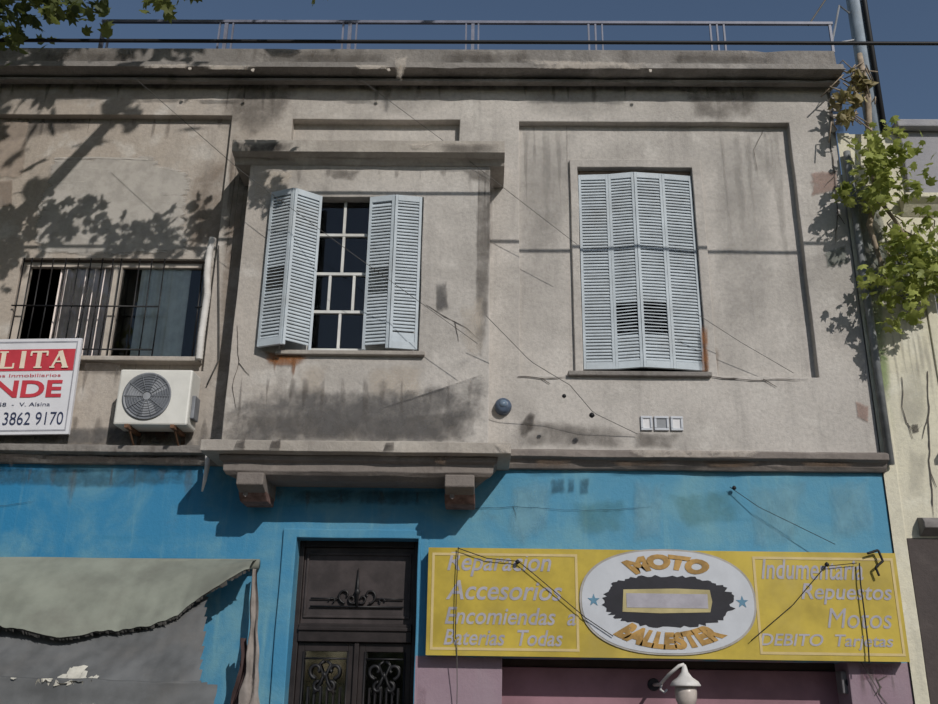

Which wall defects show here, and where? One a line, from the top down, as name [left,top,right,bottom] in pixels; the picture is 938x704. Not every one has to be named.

crack [232,329,249,407]
rust [269,353,302,372]
water stain [246,388,470,441]